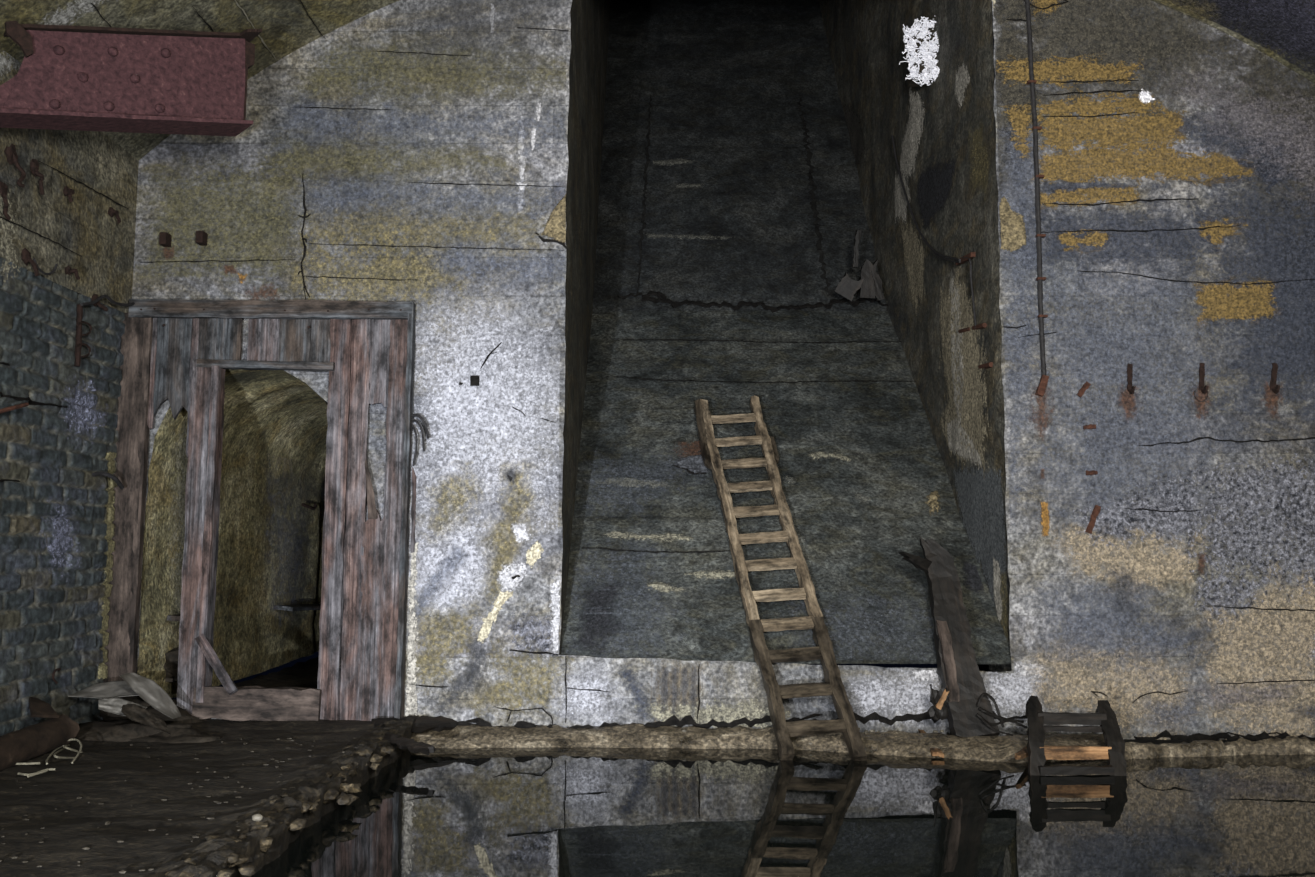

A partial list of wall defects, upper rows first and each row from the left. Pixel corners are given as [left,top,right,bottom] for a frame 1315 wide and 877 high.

crack [306,104,390,112]
peeling [996,51,1258,212]
crack [141,175,567,300]
crack [618,95,902,343]
spalling [999,197,1026,252]
peeling [1051,229,1108,255]
peeling [1198,216,1248,253]
peeling [1190,276,1280,329]
crack [1138,437,1315,446]